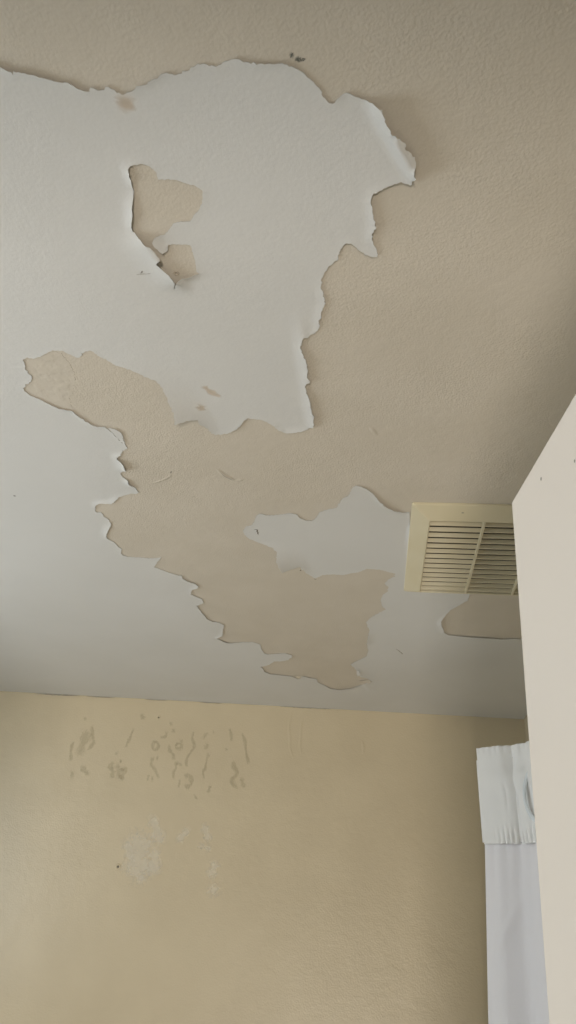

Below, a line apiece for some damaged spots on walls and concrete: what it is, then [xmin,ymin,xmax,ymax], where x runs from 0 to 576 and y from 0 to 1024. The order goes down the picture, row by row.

peeling [0,59,527,719]